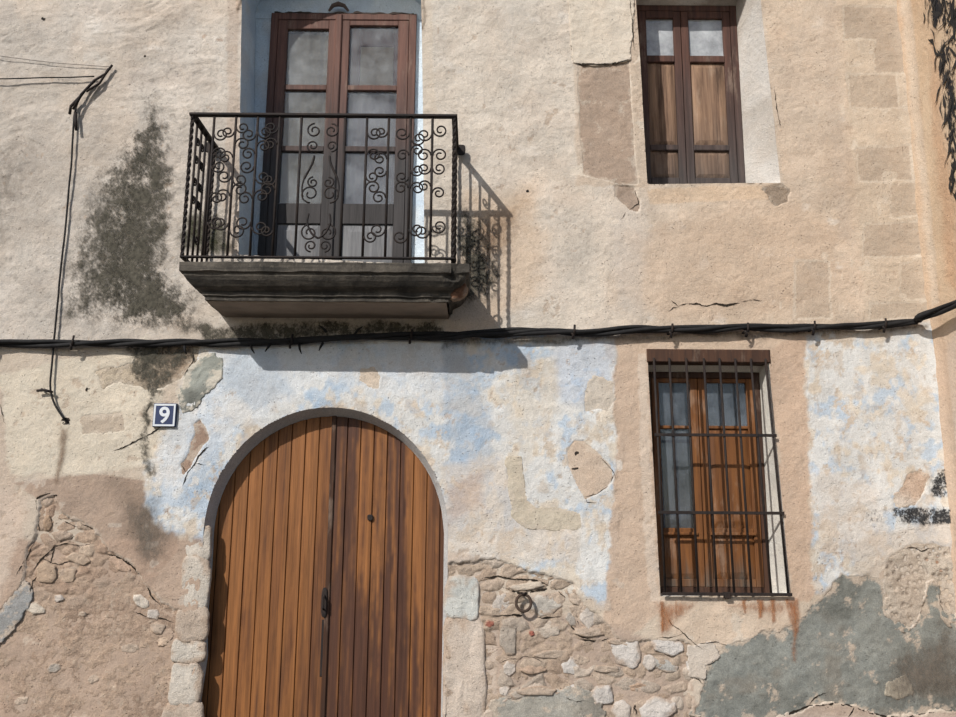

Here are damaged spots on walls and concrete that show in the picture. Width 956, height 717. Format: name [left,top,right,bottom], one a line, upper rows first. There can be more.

leakage [66,107,442,339]
flaking render [762,183,791,206]
leakage [457,210,500,303]
crack [668,299,760,312]
leakage [126,346,189,475]
flaking render [505,456,581,531]
flaking render [567,441,615,503]
rust [660,602,682,631]
rust [786,600,798,634]
peeling [686,543,956,717]
peeling [488,685,606,717]
crack [783,693,934,717]